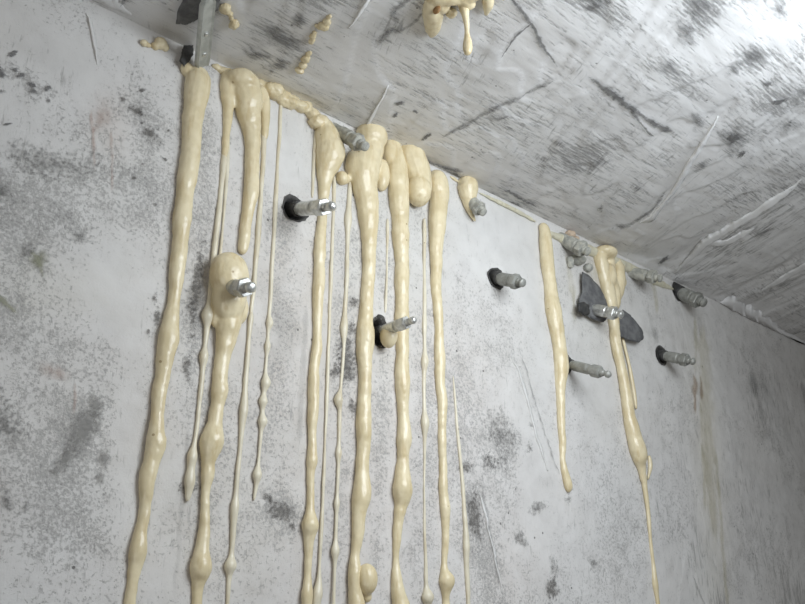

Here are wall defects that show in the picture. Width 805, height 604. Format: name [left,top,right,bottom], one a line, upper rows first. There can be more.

crack [502,0,555,63]
crack [591,79,673,136]